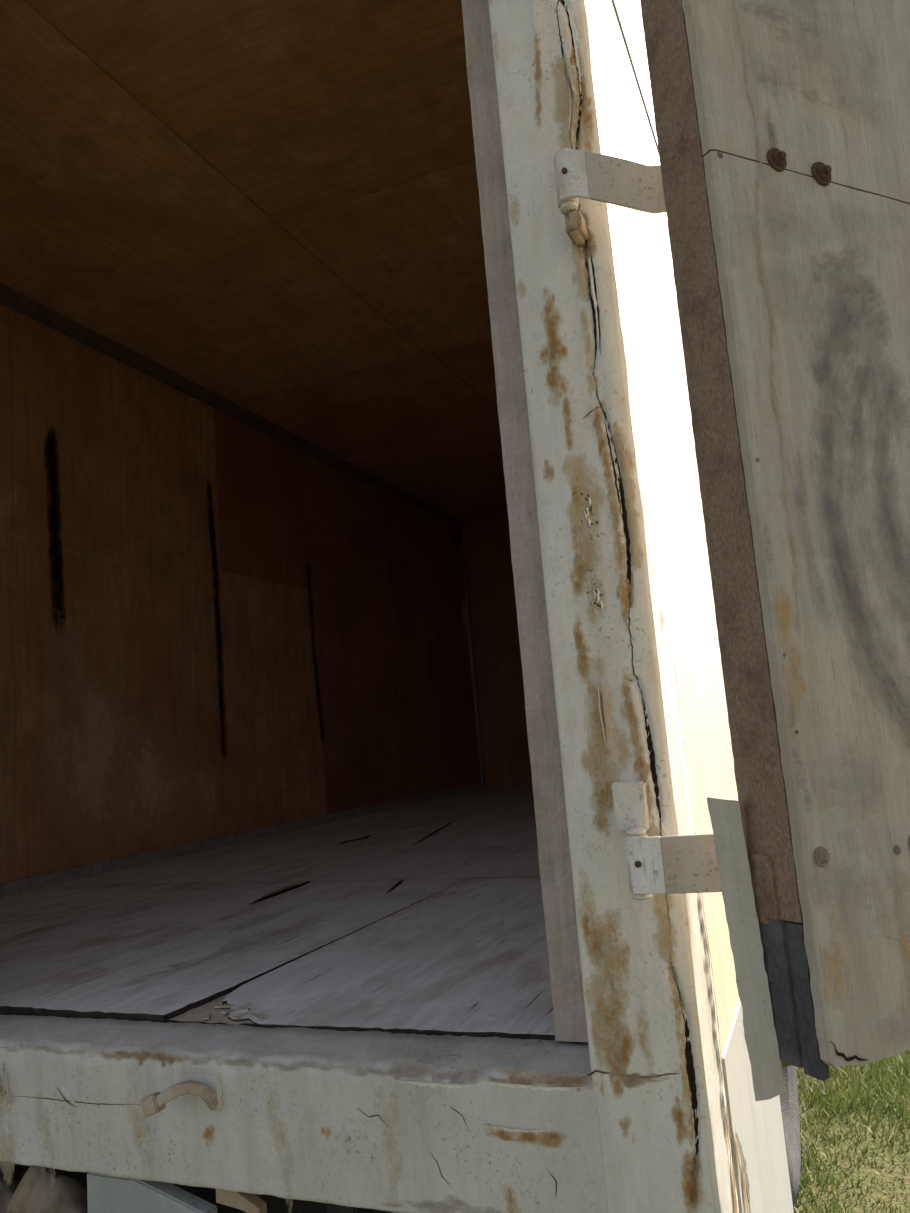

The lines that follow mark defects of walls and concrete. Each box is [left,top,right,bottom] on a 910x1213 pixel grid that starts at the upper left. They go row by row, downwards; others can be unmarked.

crack [557,0,584,150]
corrosion [572,213,596,298]
corrosion [540,289,644,620]
crack [583,245,662,836]
corrosion [574,623,658,837]
crack [248,881,311,905]
crack [386,879,404,894]
corrosion [581,890,652,1096]
corrosion [654,894,702,1213]
crack [830,1041,868,1061]